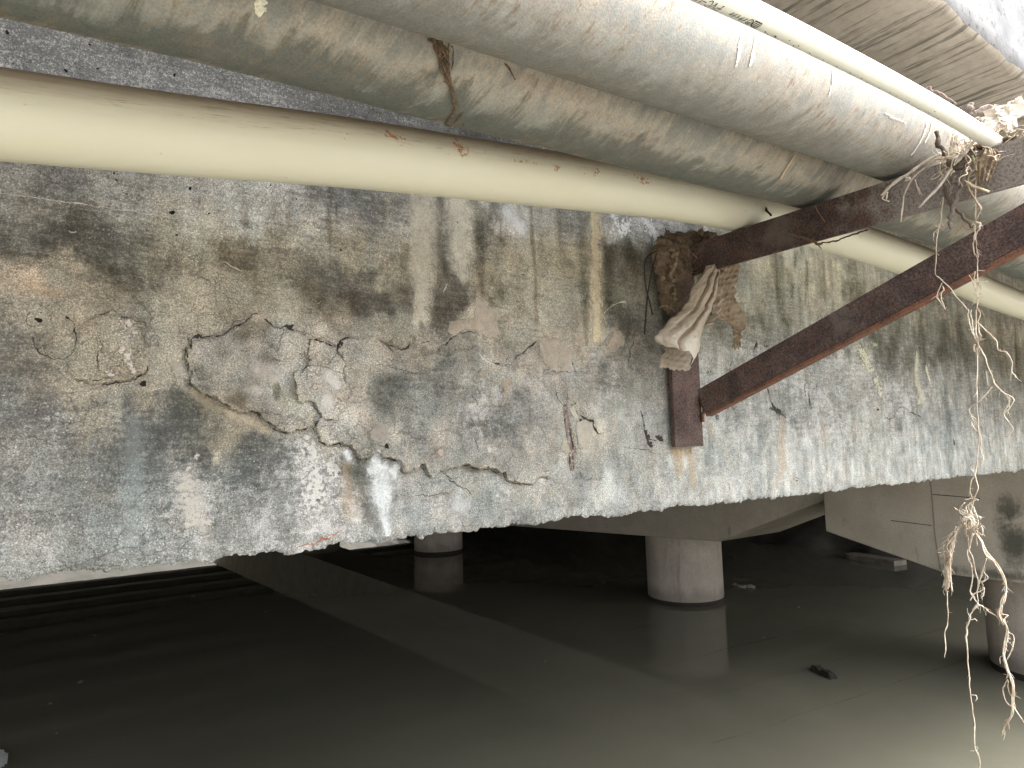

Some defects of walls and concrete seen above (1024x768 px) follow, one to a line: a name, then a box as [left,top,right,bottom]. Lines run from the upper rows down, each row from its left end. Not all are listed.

damp [412,195,433,325]
damp [590,212,662,342]
crack [26,309,141,382]
damp [119,344,141,378]
crack [185,313,349,375]
flaking render [171,297,593,486]
crack [376,331,487,374]
crack [505,341,600,434]
damp [915,351,931,405]
damp [169,453,220,545]
damp [283,430,352,526]
damp [367,450,400,536]